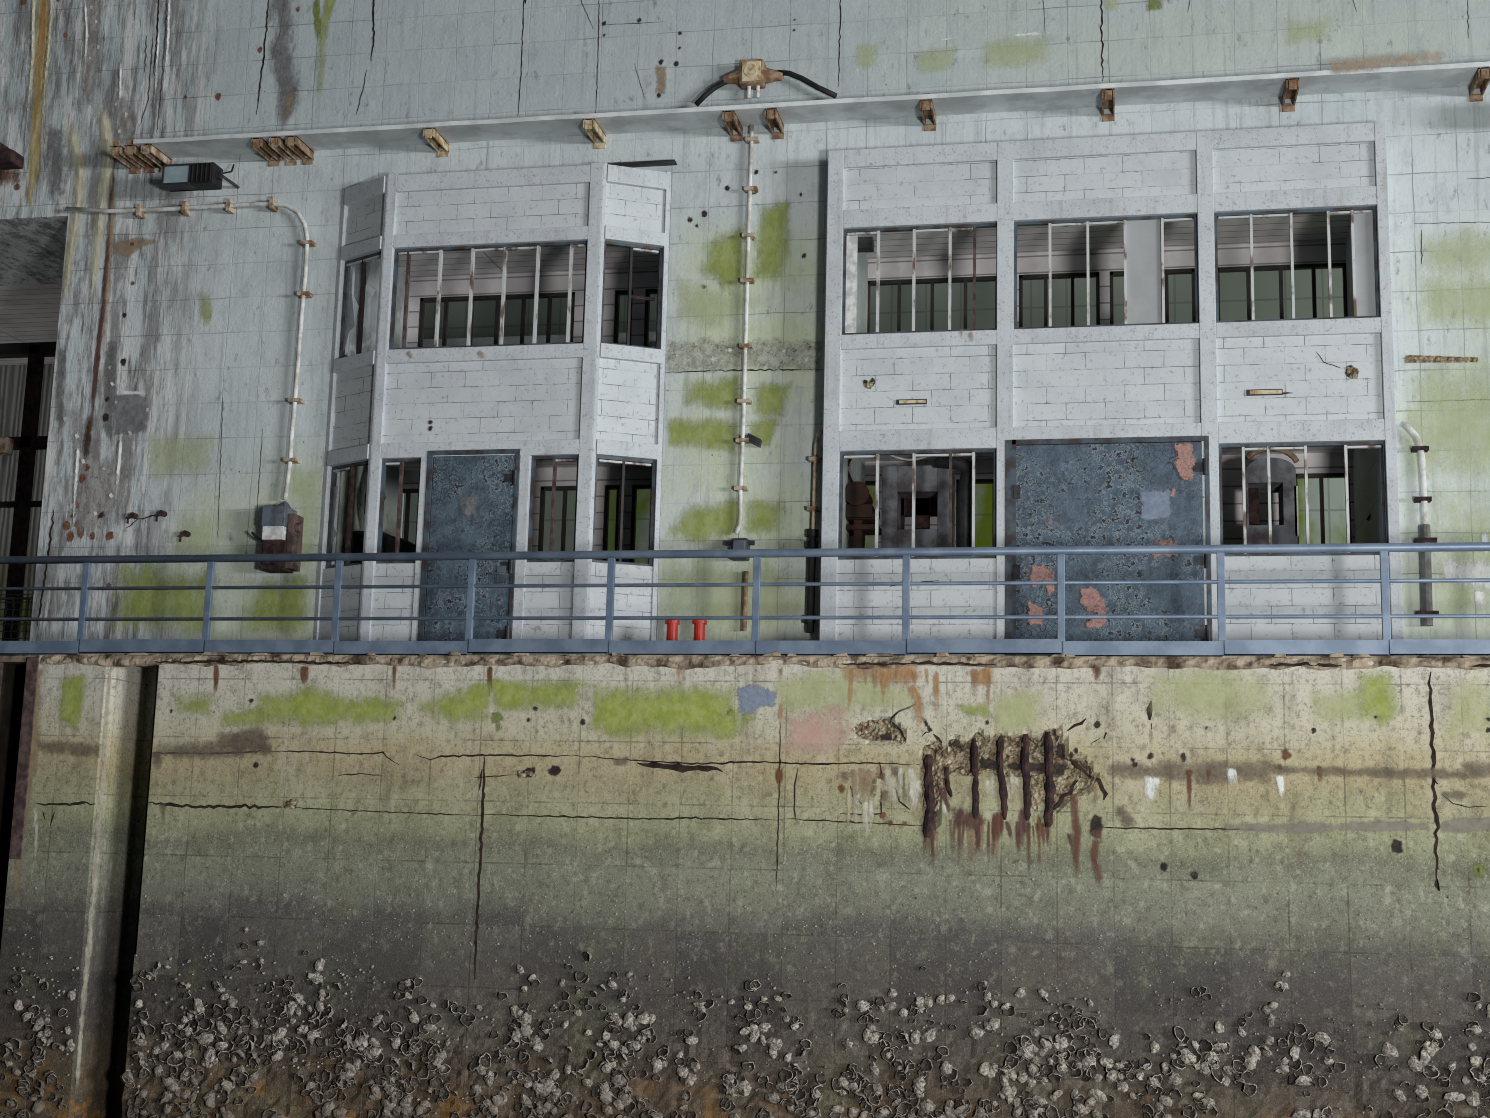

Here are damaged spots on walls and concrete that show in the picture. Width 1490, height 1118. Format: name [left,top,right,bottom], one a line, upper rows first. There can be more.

corrosion [79,157,154,483]
corrosion [63,502,114,542]
peeling [1140,443,1195,522]
corrosion [846,665,939,717]
corrosion [971,669,992,700]
crack [147,750,923,979]
spalling [852,704,1107,838]
corrosion [924,787,1103,880]
crack [1085,760,1252,830]
crack [1427,672,1440,891]